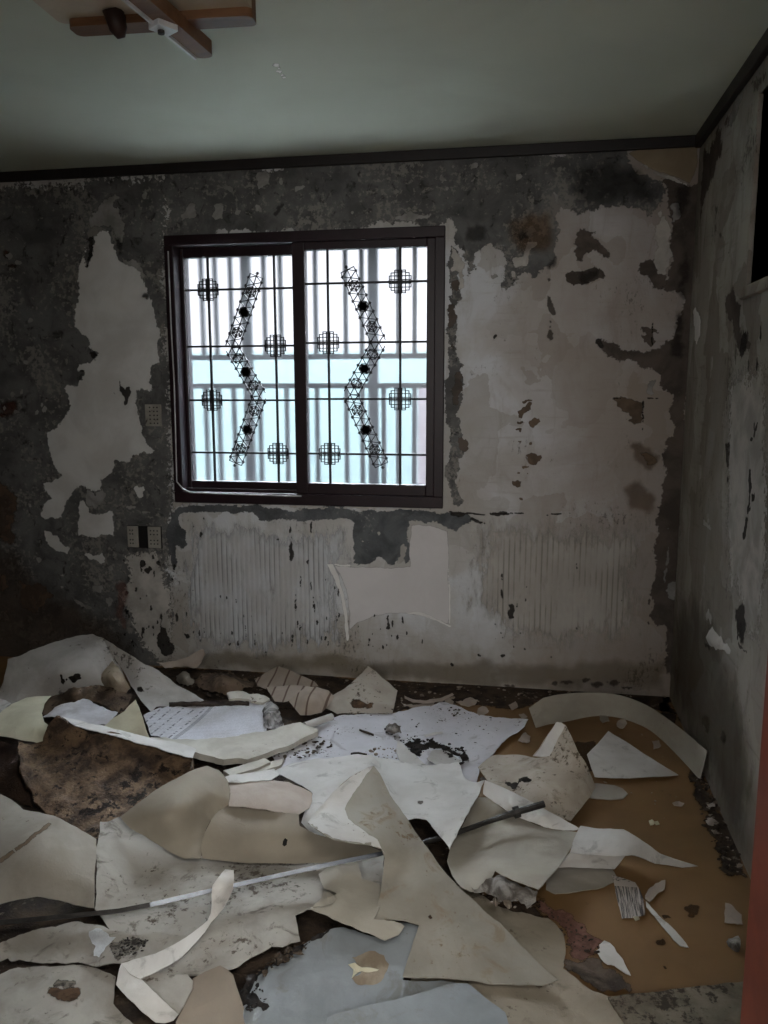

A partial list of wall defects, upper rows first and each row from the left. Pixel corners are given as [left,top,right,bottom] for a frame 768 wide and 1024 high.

water stain [0,482,205,663]
peeling [0,69,766,675]
water stain [725,287,768,646]